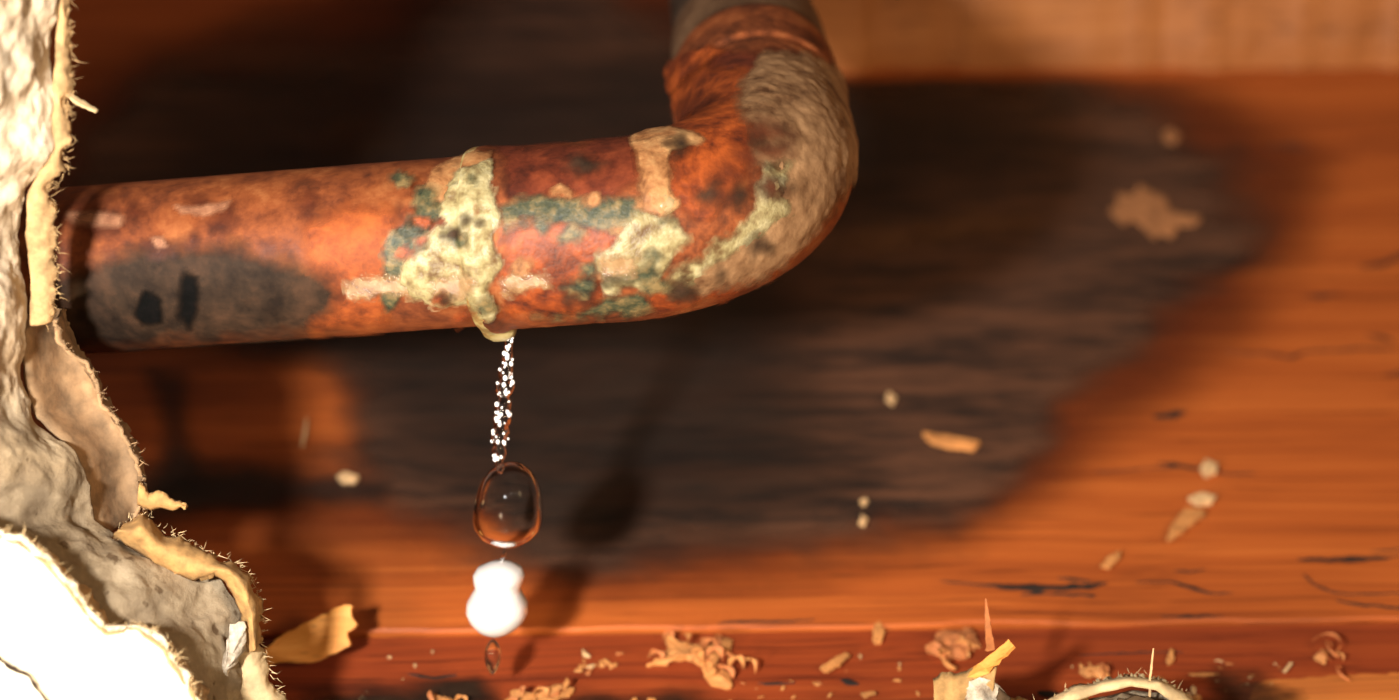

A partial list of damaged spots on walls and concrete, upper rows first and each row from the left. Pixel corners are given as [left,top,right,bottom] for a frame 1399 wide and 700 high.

corrosion [663,46,754,221]
corrosion [395,207,430,258]
corrosion [500,223,620,317]
leakage [54,0,1297,579]
corrosion [643,268,778,316]
flaking render [222,621,247,676]
flaking render [965,677,1011,700]